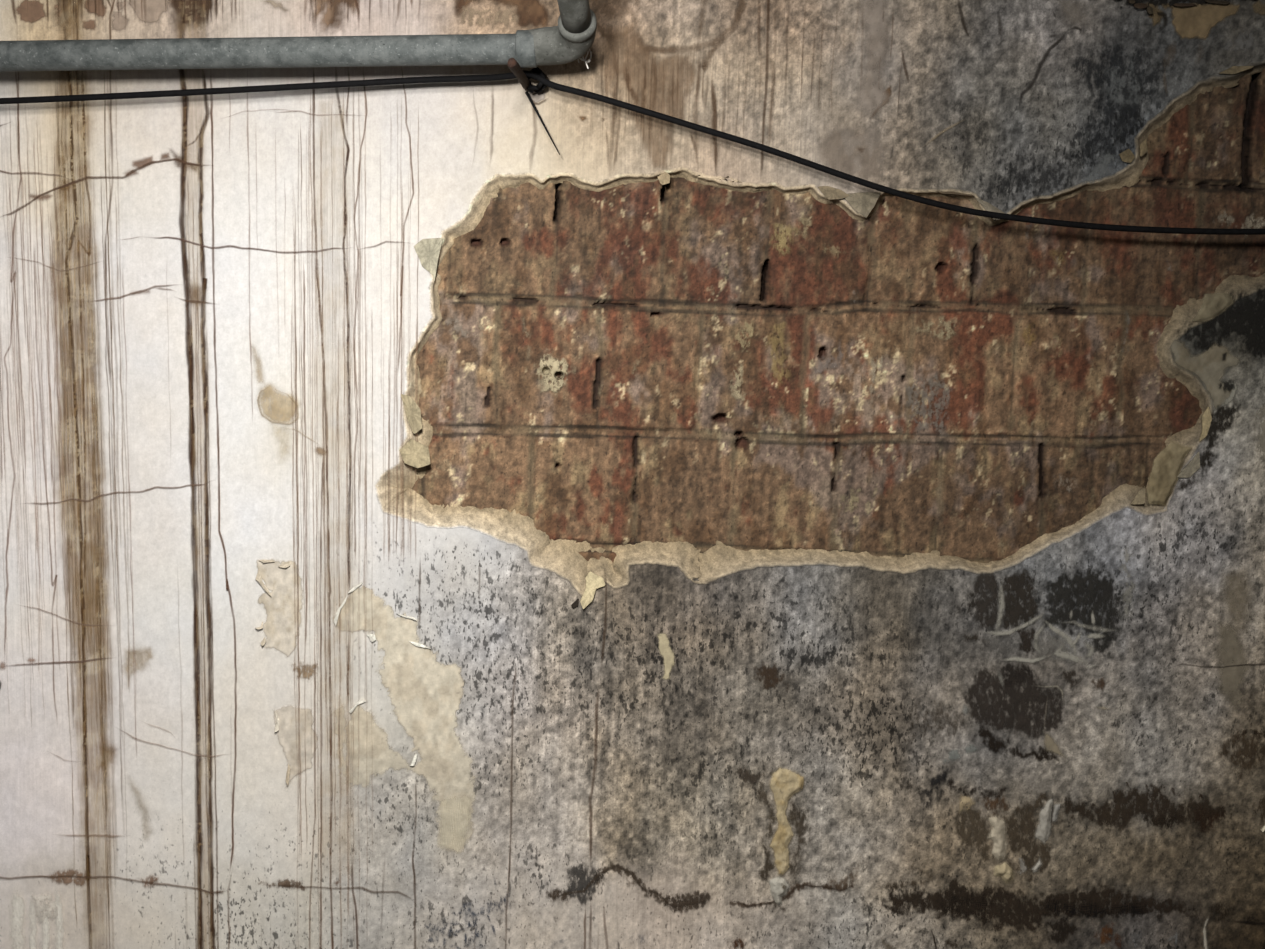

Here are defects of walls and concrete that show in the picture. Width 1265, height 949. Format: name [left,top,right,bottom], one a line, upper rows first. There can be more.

peeling [1120,0,1265,39]
crack [97,285,207,303]
crack [159,237,341,253]
flaking render [374,33,1265,609]
crack [36,484,202,504]
damp [1178,405,1240,489]
peeling [255,559,303,657]
peeling [333,582,475,850]
damp [882,566,1230,949]
damp [568,864,604,904]
crack [546,697,853,949]
damp [736,767,811,910]